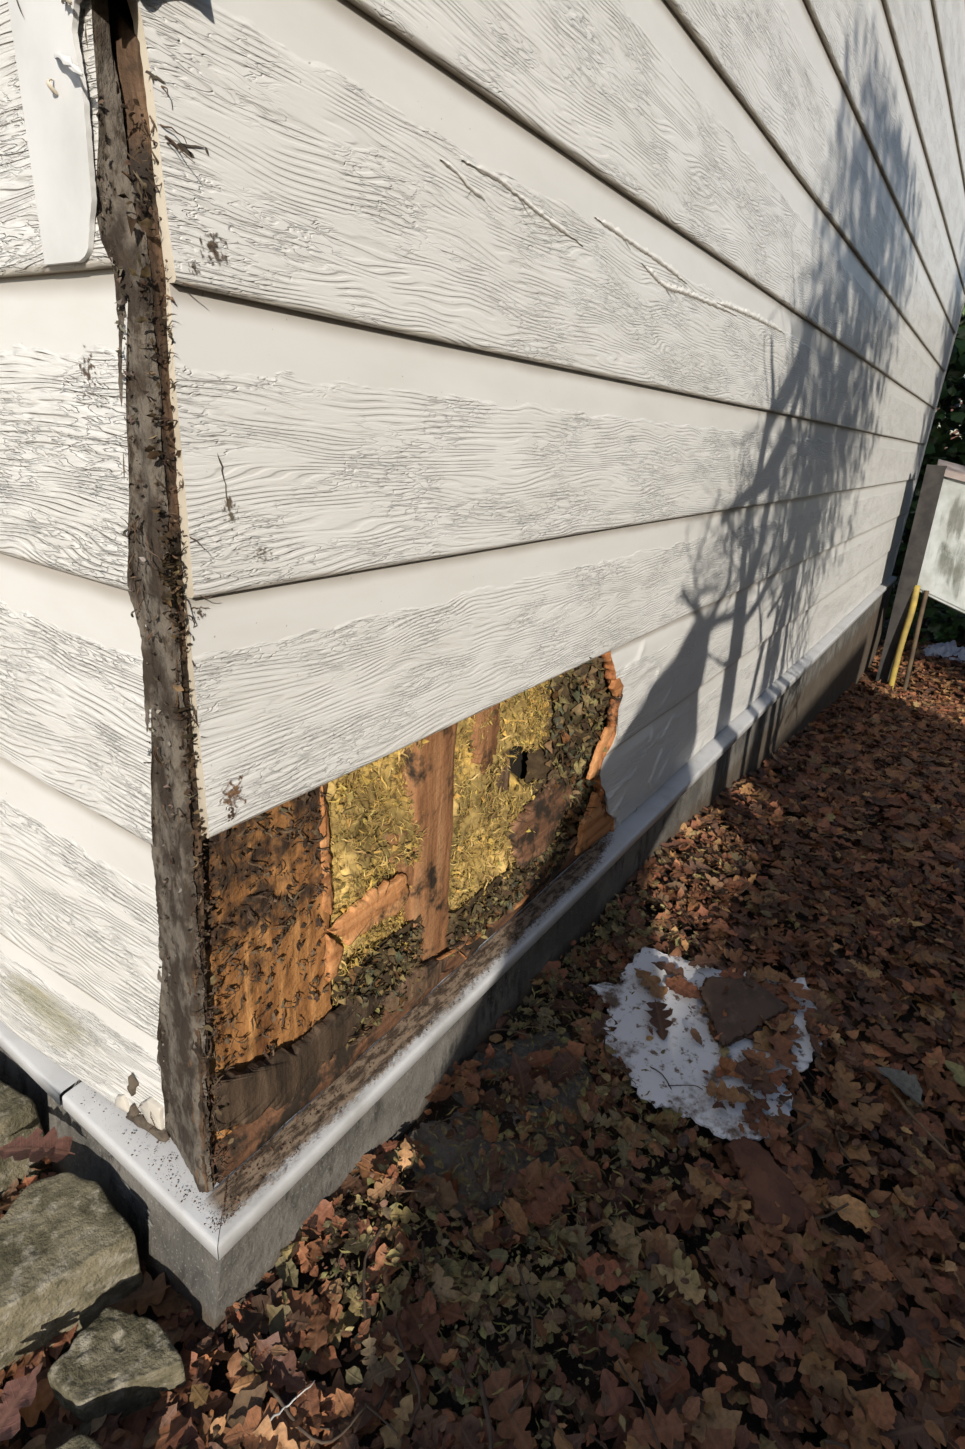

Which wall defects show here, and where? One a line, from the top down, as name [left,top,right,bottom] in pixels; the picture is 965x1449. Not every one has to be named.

spalling [61,0,88,48]
crack [440,159,784,334]
spalling [93,48,484,1192]
spalling [467,703,500,776]
spalling [508,651,624,910]